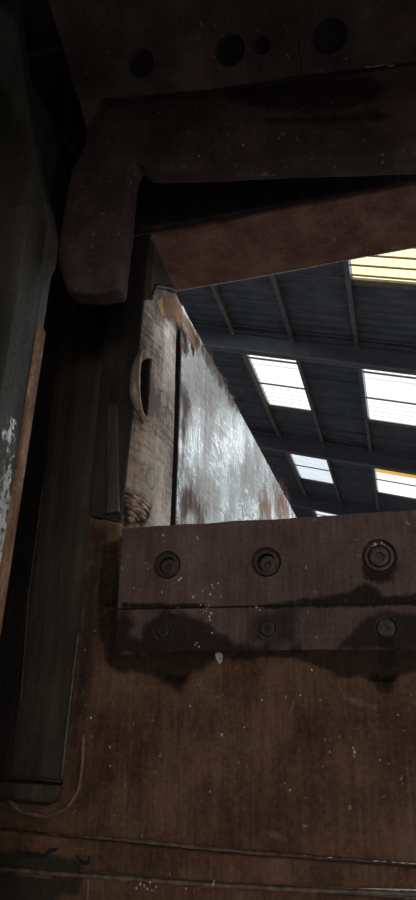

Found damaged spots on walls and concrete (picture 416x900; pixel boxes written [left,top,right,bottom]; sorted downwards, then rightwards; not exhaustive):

rust [157,293,238,411]
rust [179,383,190,463]
peeling [0,417,16,565]
rust [177,478,207,525]
rust [259,486,289,520]